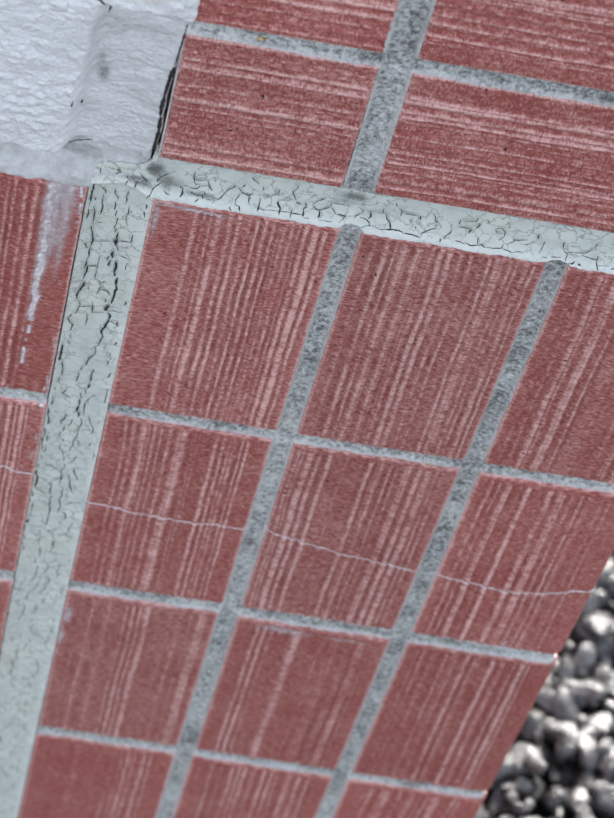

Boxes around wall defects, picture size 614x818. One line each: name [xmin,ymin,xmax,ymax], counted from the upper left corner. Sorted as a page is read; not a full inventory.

crack [152,25,188,151]
crack [0,169,614,816]